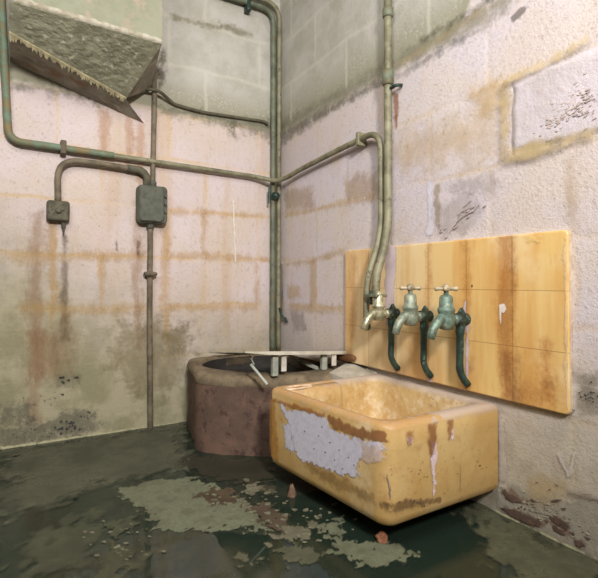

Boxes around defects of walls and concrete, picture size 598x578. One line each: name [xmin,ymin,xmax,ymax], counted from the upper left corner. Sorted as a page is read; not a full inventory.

spalling [499,487,590,548]